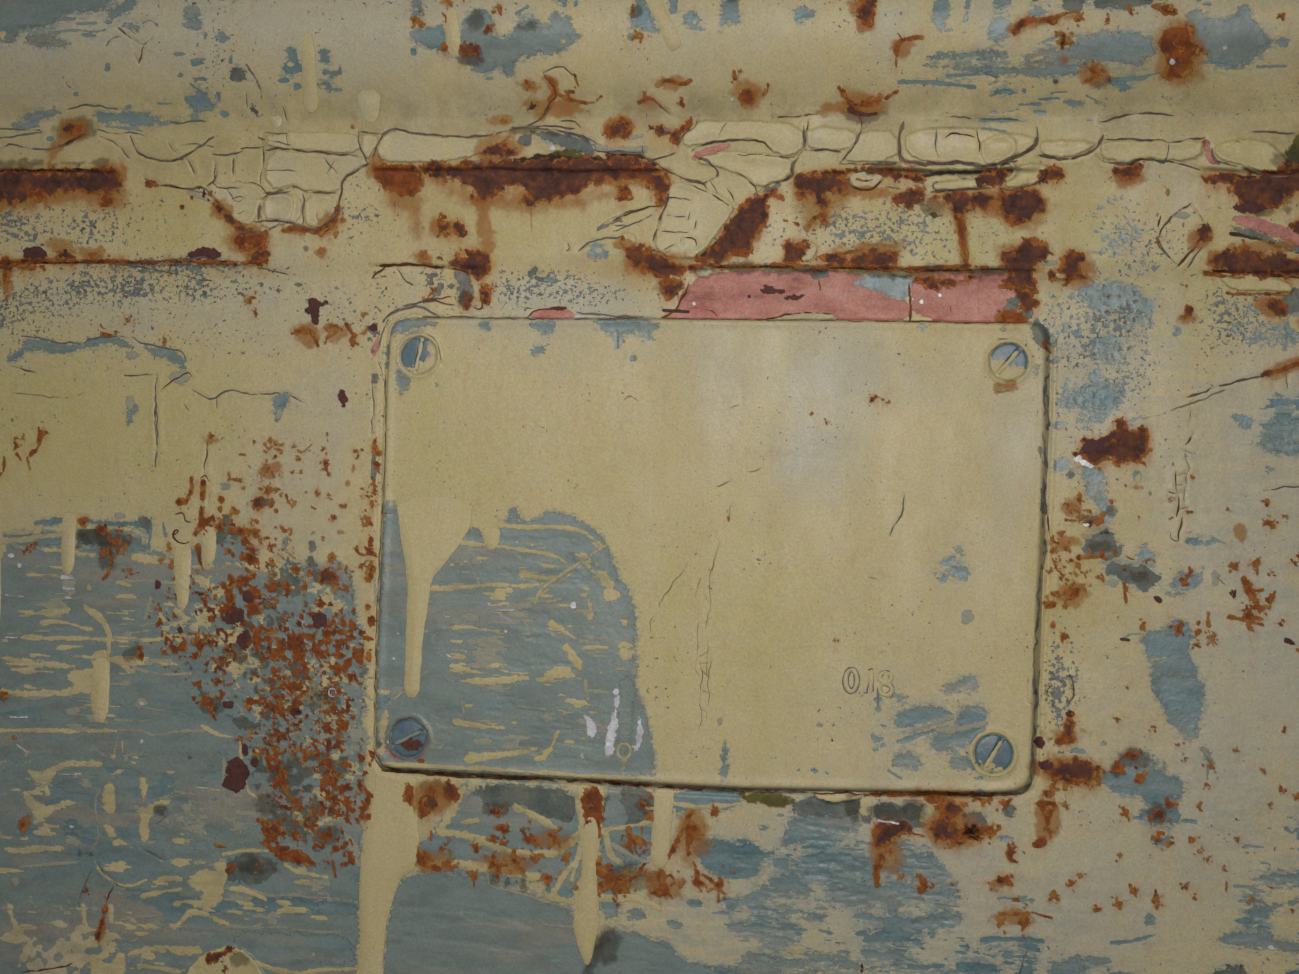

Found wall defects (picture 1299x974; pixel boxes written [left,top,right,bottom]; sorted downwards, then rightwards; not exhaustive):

peeling [410,0,581,80]
rust [368,66,693,310]
crack [106,106,1294,252]
peeling [528,183,1155,431]
rust [688,158,1090,313]
crack [1156,203,1212,267]
rust [1072,415,1152,470]
rust [135,432,571,887]
peeling [0,500,1156,974]
rust [859,711,1105,938]
peeling [1097,747,1197,850]
peeling [1120,618,1218,780]